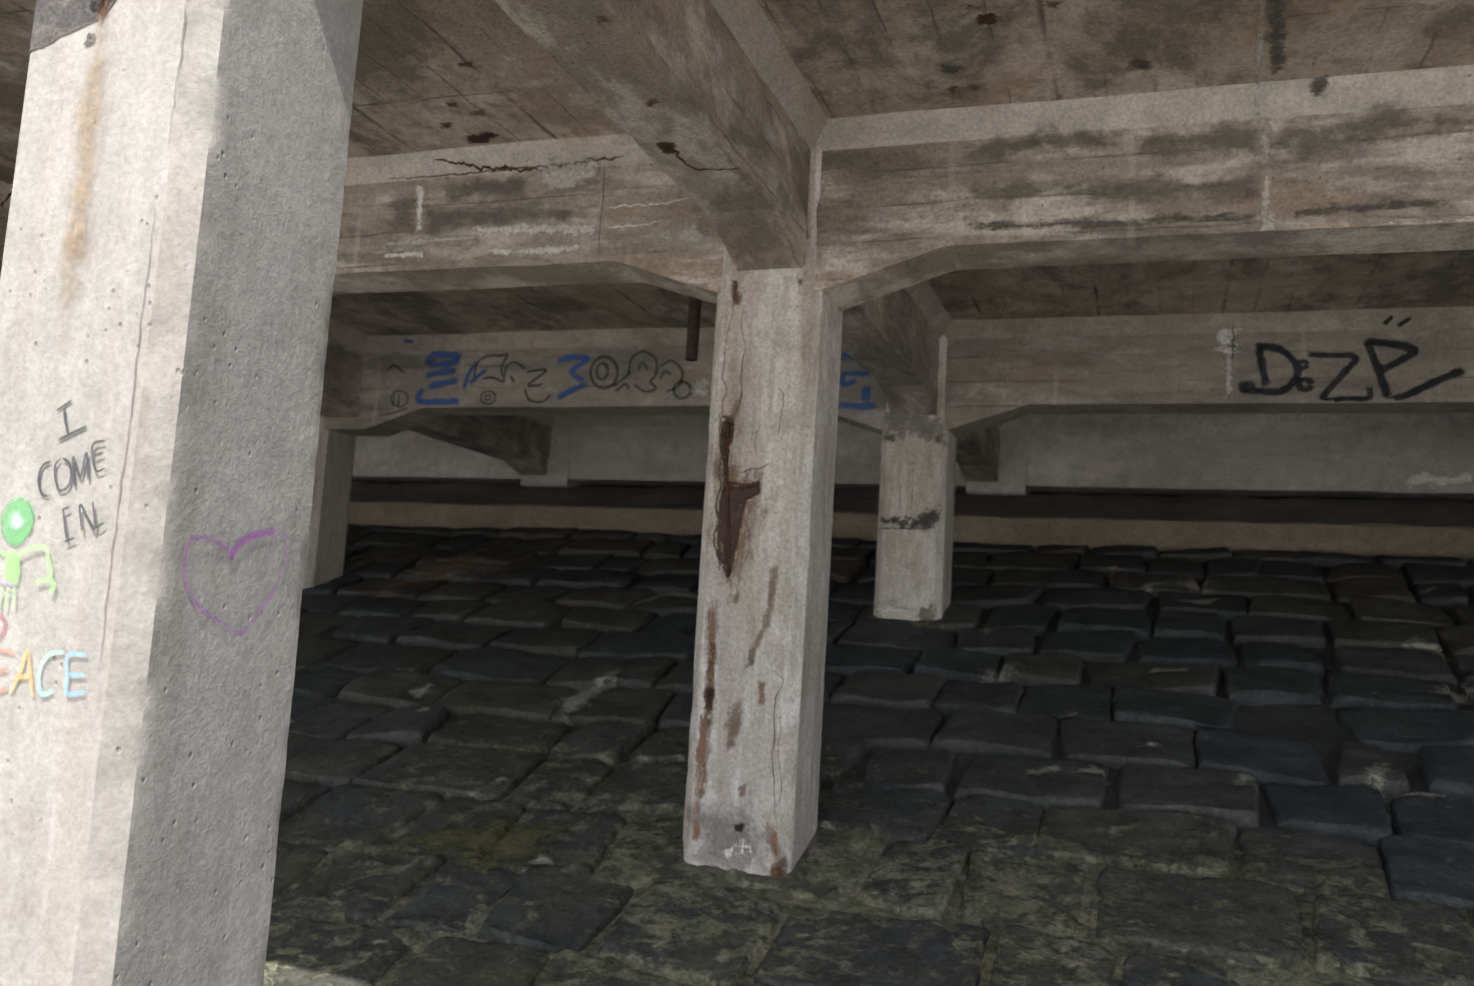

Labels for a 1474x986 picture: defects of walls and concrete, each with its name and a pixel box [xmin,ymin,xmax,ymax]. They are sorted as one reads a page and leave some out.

damp [968,0,1474,231]
crack [388,132,739,254]
corrosion [746,568,778,667]
corrosion [692,593,741,841]
corrosion [766,826,787,879]